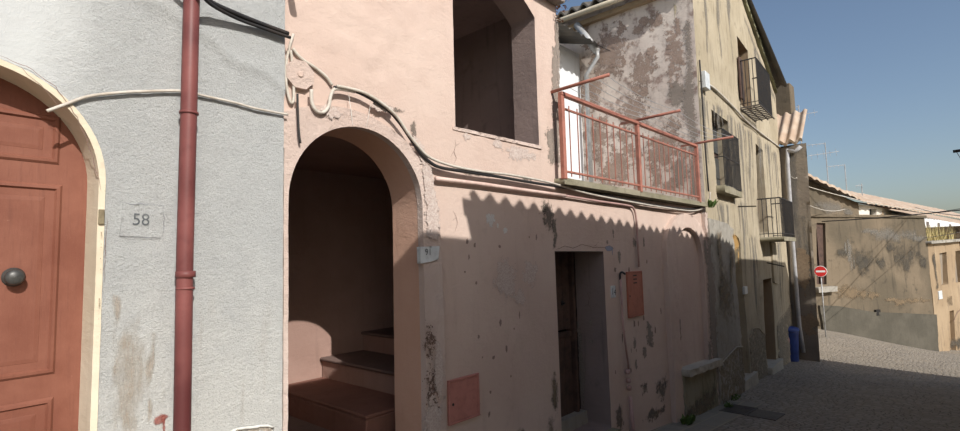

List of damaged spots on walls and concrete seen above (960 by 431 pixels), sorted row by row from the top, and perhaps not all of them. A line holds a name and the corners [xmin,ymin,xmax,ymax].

crack [2,56,101,189]
flaking render [544,22,560,167]
flaking render [580,10,702,198]
crack [104,202,165,280]
water stain [541,200,557,248]
flaking render [703,231,718,379]
flaking render [777,303,820,366]